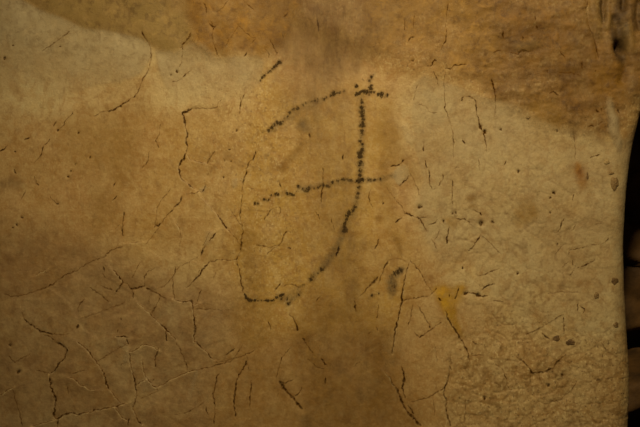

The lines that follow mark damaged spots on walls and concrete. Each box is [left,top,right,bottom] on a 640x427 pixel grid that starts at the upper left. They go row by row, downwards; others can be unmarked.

crack [156,108,214,226]
crack [25,214,244,424]
crack [393,267,502,356]
crack [233,351,253,416]
crack [277,357,302,408]
crack [391,368,421,425]